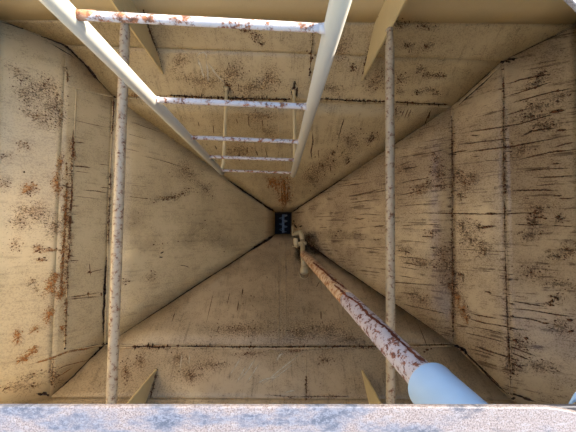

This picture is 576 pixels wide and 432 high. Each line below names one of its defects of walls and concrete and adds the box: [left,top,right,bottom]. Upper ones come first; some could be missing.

corrosion [6,129,113,347]
corrosion [262,121,379,211]